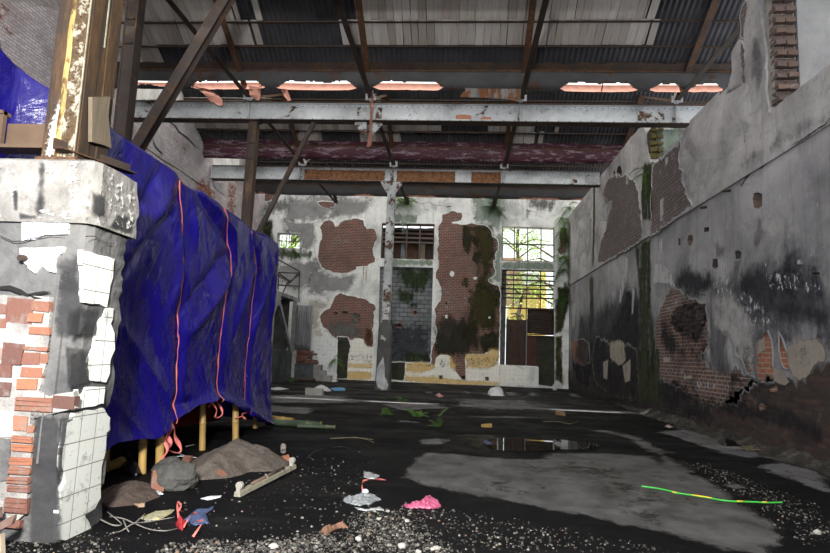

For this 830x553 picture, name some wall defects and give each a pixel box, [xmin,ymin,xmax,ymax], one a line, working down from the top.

spalling [0,295,80,553]
flaking render [317,201,378,274]
flaking render [319,210,501,390]
leakage [478,331,501,353]
flaking render [459,336,639,418]
flaking render [597,128,694,265]
leakage [612,238,739,404]
leakage [713,267,770,363]
flaking render [654,287,830,492]
leakage [761,258,822,297]